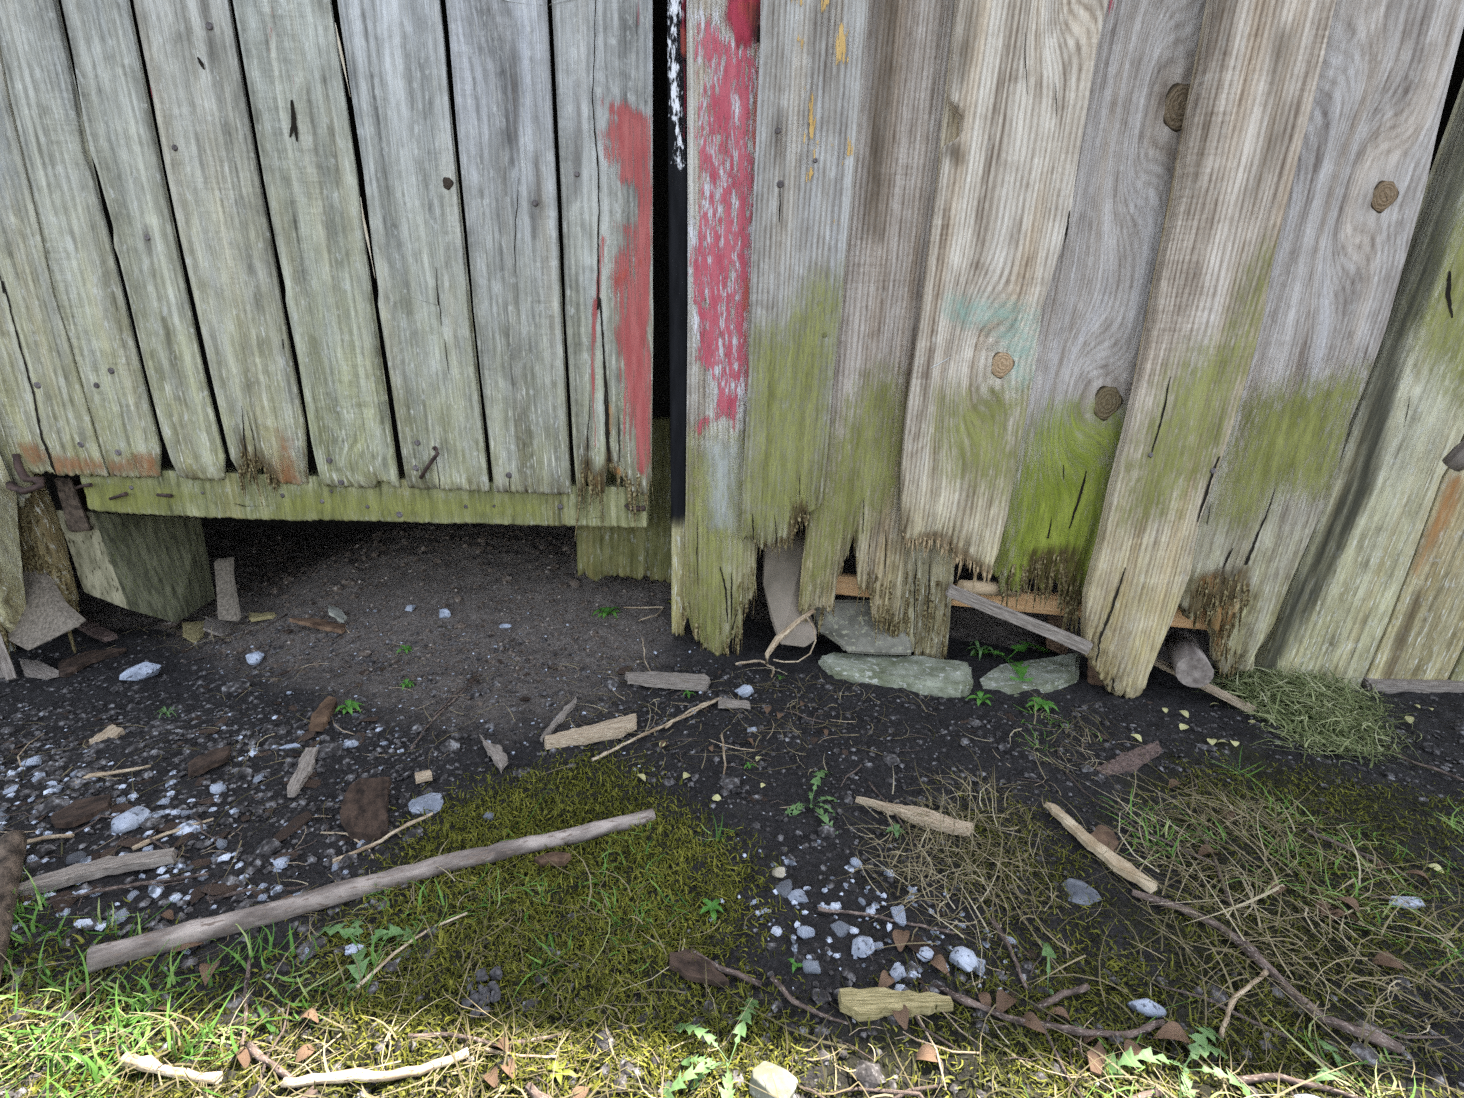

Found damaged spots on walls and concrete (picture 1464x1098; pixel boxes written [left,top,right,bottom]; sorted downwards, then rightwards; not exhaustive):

peeling [591,0,761,524]
crack [0,277,56,473]
crack [1150,377,1171,458]
crack [1197,456,1276,569]